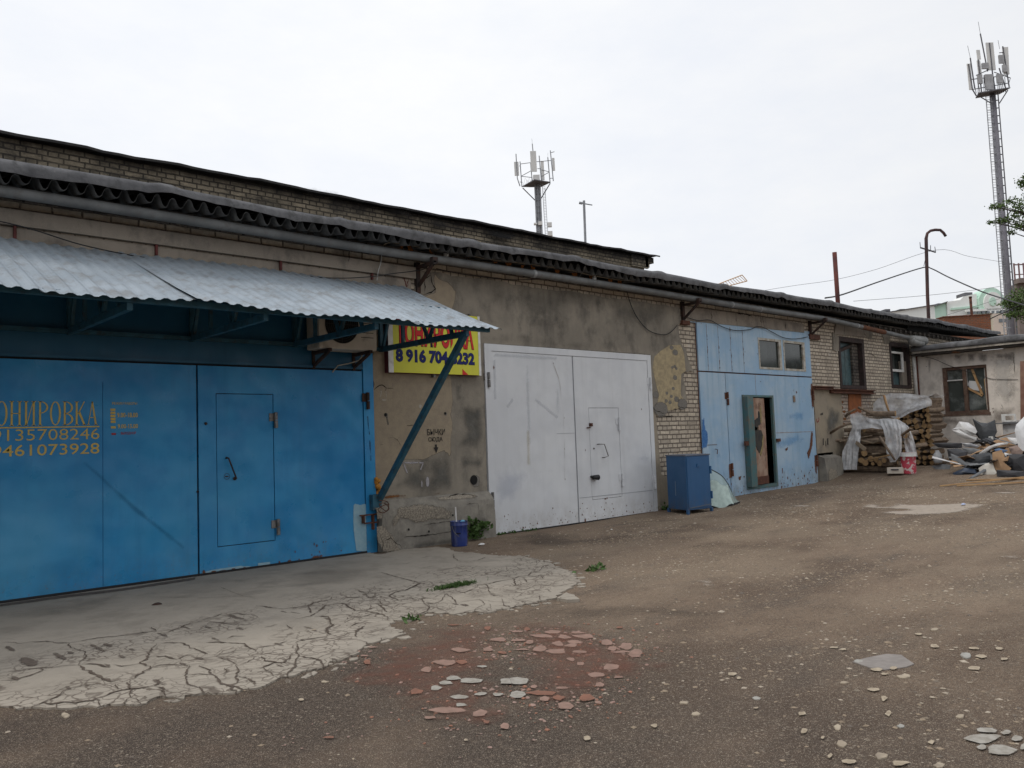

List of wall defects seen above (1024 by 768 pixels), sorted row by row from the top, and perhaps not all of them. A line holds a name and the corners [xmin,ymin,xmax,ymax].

flaking render [653,345,687,417]
rust [781,431,817,489]
crack [2,494,571,708]